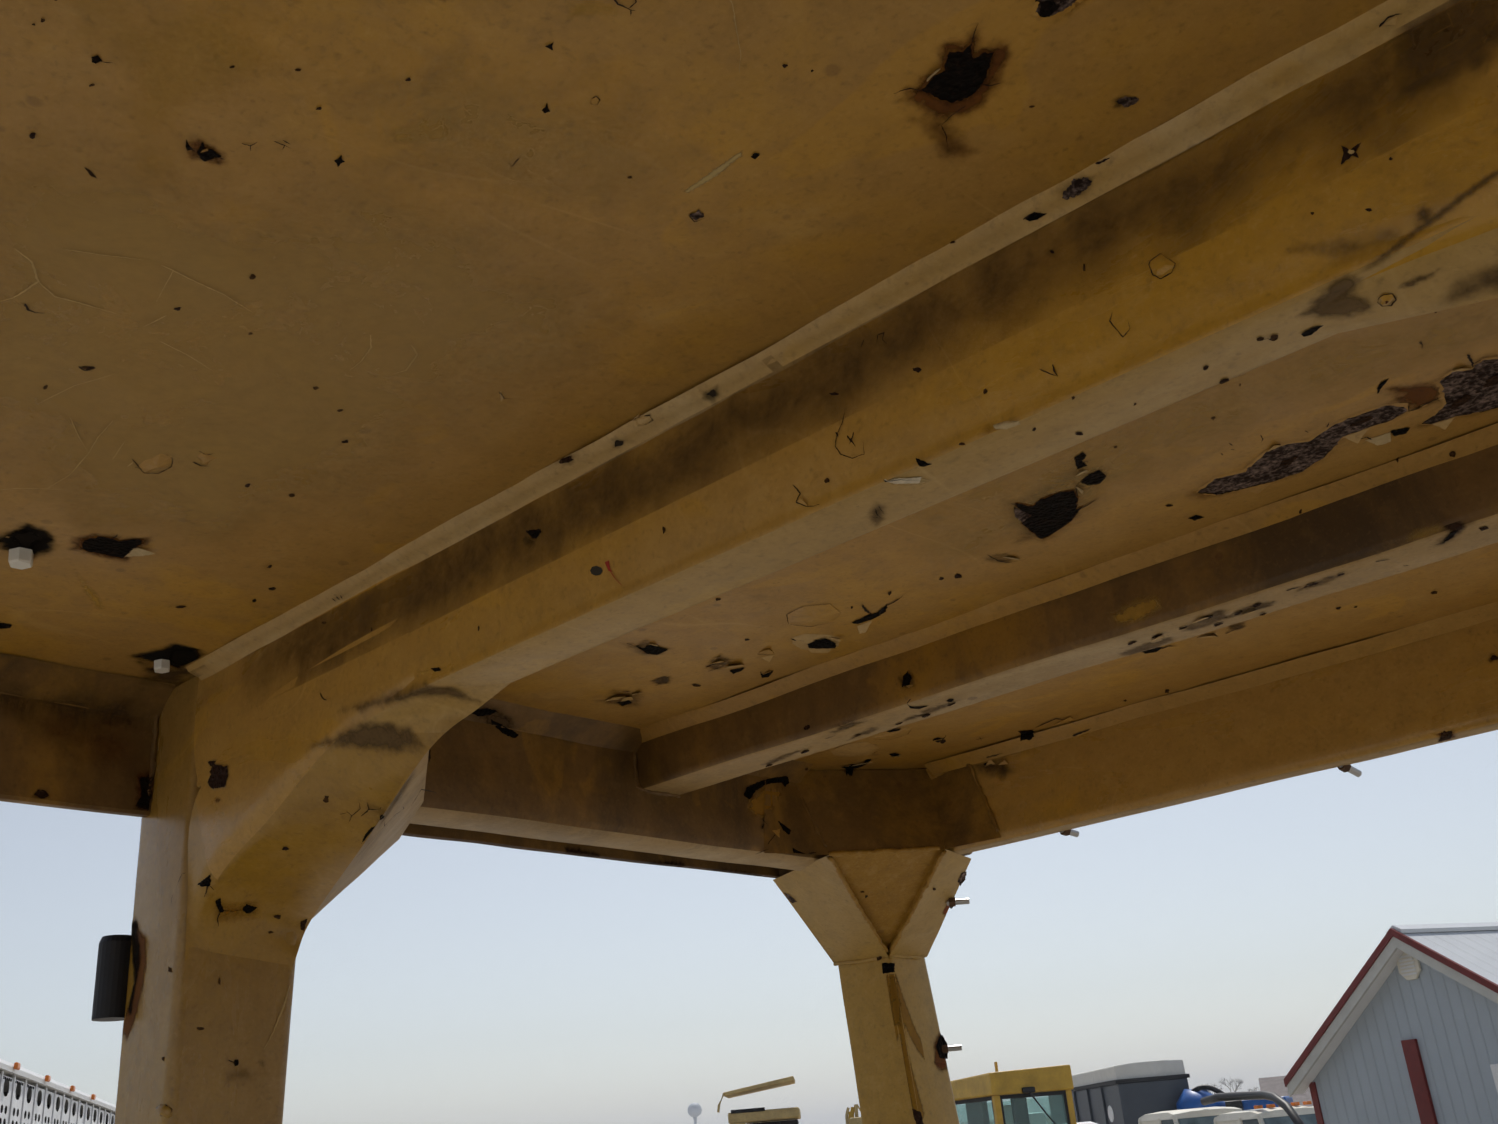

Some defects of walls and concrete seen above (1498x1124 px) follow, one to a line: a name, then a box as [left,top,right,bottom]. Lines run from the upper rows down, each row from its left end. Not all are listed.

peeling [1028,0,1084,21]
peeling [1194,354,1498,496]
peeling [125,548,155,557]